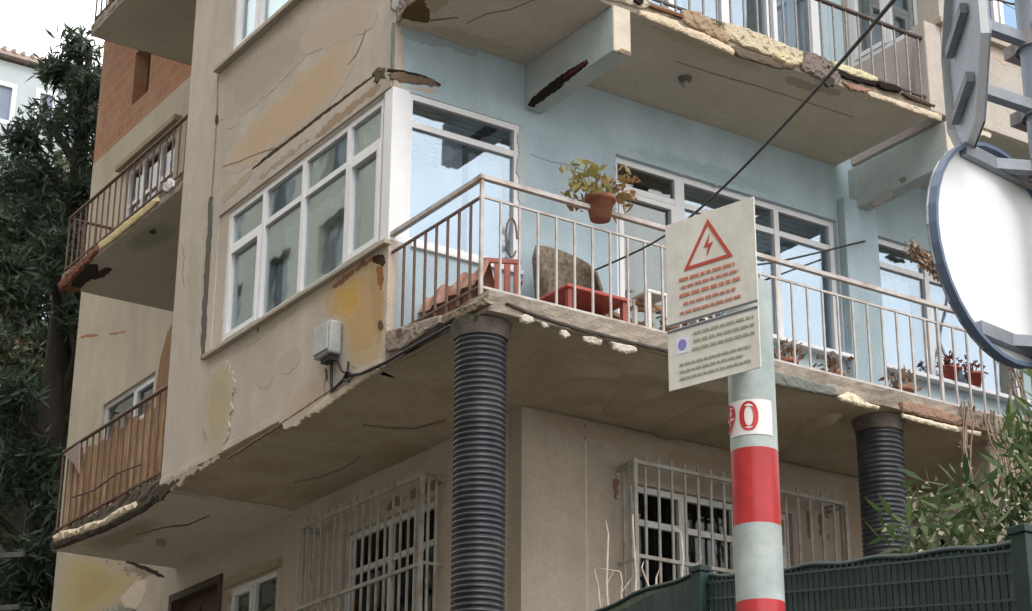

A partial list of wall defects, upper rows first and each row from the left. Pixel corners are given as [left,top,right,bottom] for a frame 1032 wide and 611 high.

spalling [390,0,412,18]
spalling [372,67,440,93]
spalling [528,60,589,107]
spalling [612,0,942,121]
spalling [58,178,175,292]
leakage [321,254,389,372]
spalling [519,314,638,355]
spalling [50,491,159,550]